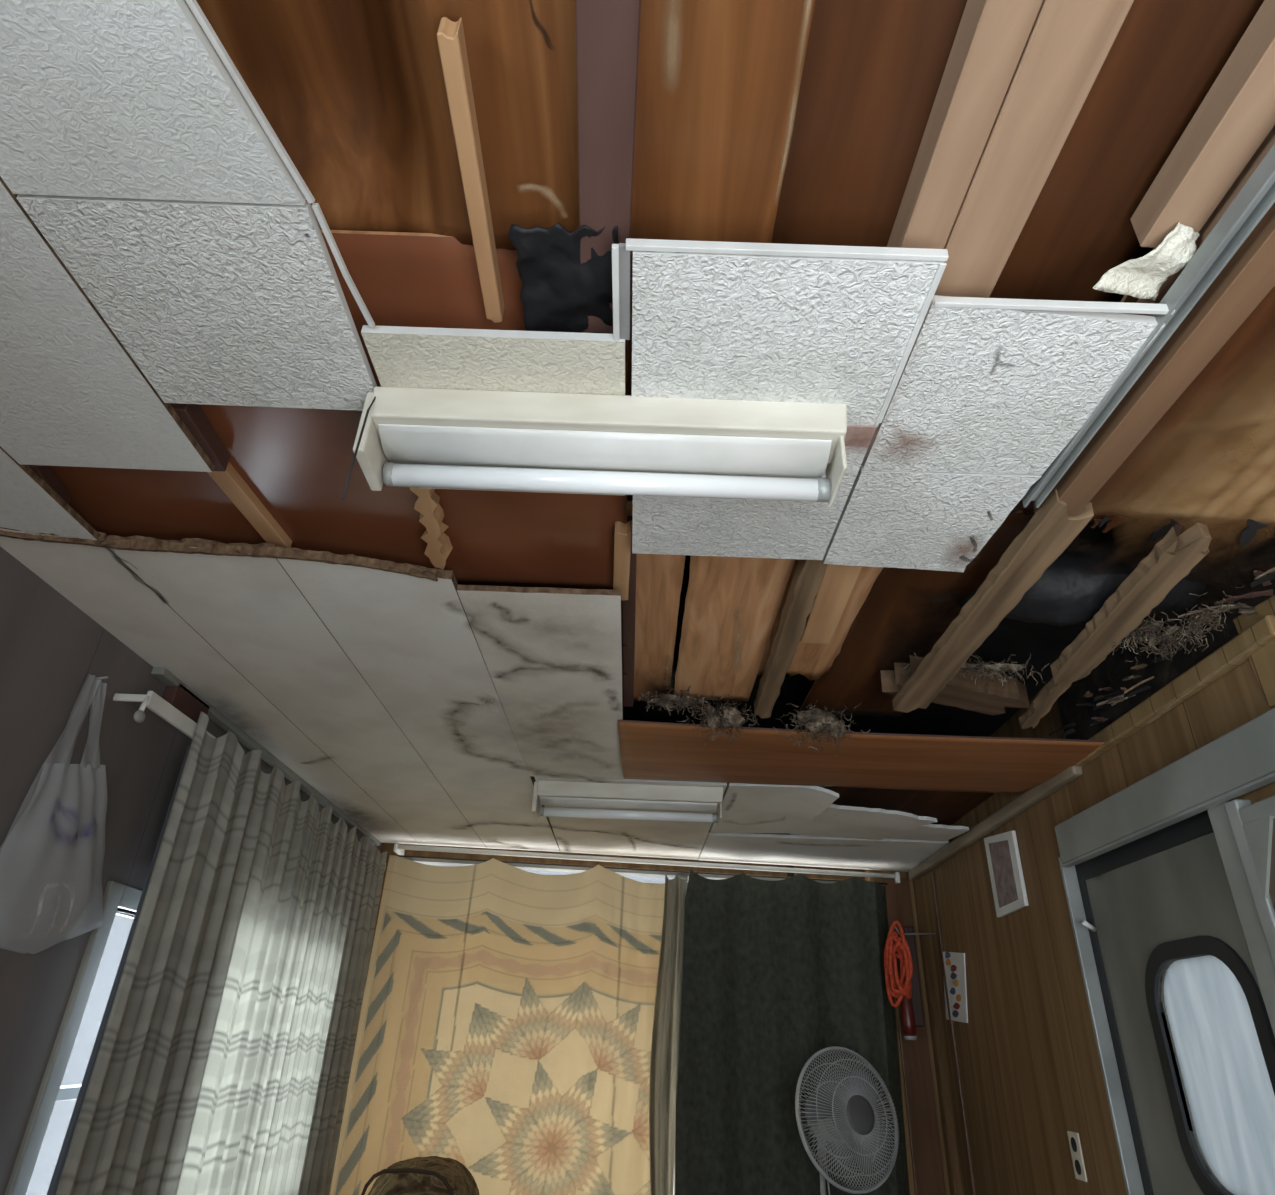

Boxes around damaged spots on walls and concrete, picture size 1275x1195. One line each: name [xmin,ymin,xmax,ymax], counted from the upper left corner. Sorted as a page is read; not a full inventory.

crack [530,0,550,48]
spalling [959,536,977,560]
damp [1185,554,1275,601]